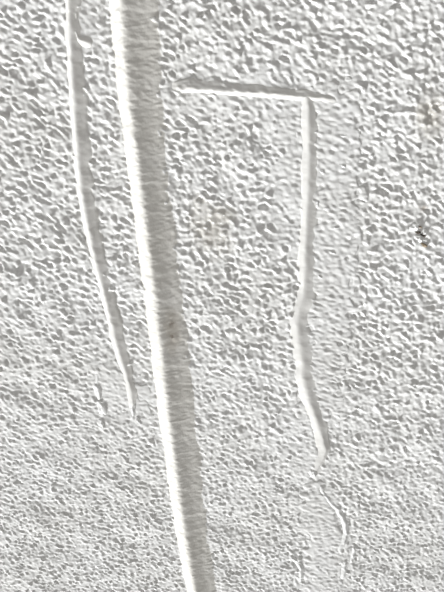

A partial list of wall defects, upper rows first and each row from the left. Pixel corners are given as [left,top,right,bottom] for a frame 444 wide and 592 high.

crack [65,0,141,424]
crack [172,78,356,581]